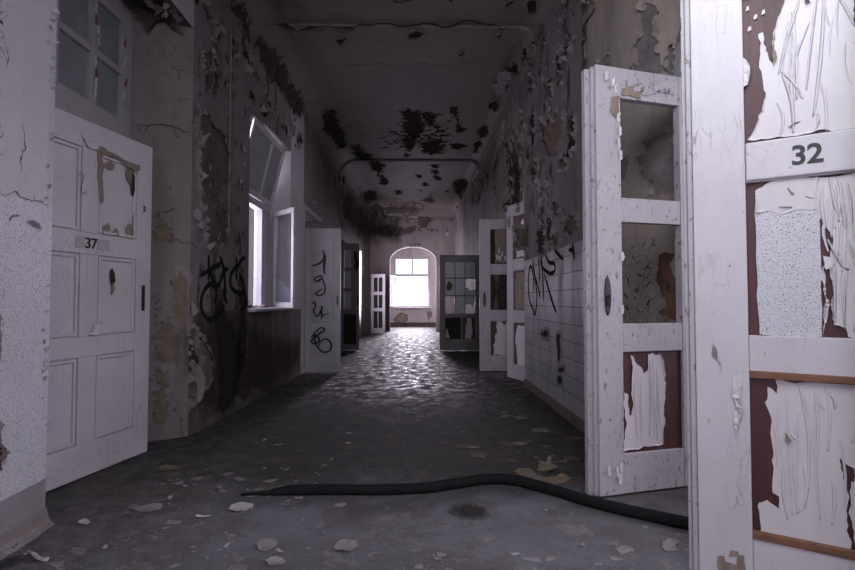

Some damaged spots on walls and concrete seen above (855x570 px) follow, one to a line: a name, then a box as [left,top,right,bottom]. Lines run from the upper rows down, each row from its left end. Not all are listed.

crack [0,191,47,205]
peeling [93,141,140,203]
peeling [102,215,134,239]
peeling [195,107,247,252]
peeling [194,0,304,150]
flaking render [596,52,674,201]
flaking render [626,0,677,76]
peeling [743,0,855,141]
peeling [814,173,855,338]
flaking render [148,264,215,428]
peeling [624,353,666,451]
peeling [758,380,855,549]